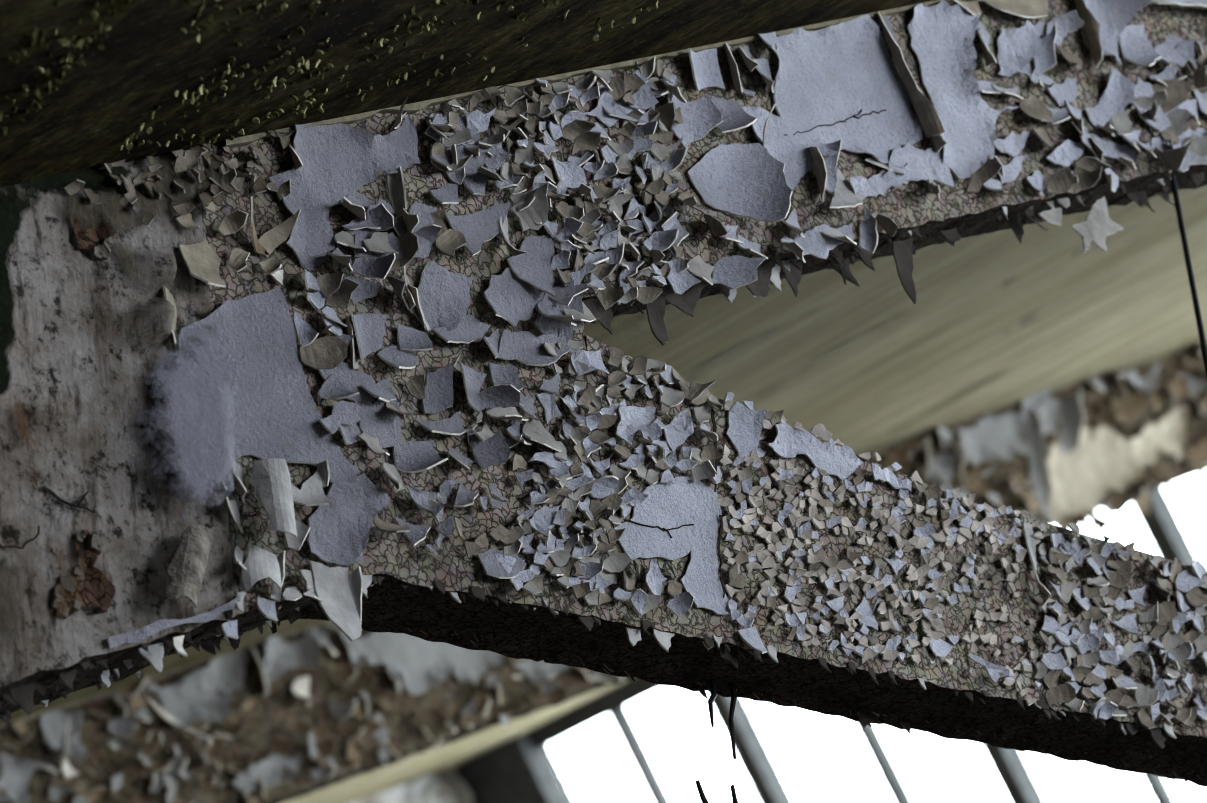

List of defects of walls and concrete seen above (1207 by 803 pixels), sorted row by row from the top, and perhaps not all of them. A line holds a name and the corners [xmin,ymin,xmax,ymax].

crack [784,109,886,136]
peeling [101,156,200,230]
water stain [62,164,249,276]
peeling [178,241,226,287]
peeling [170,144,248,236]
peeling [245,0,1207,750]
crack [0,525,40,549]
crack [42,486,95,513]
peeling [178,269,504,803]
peeling [107,544,285,650]
peeling [0,710,139,803]
peeling [88,627,338,803]